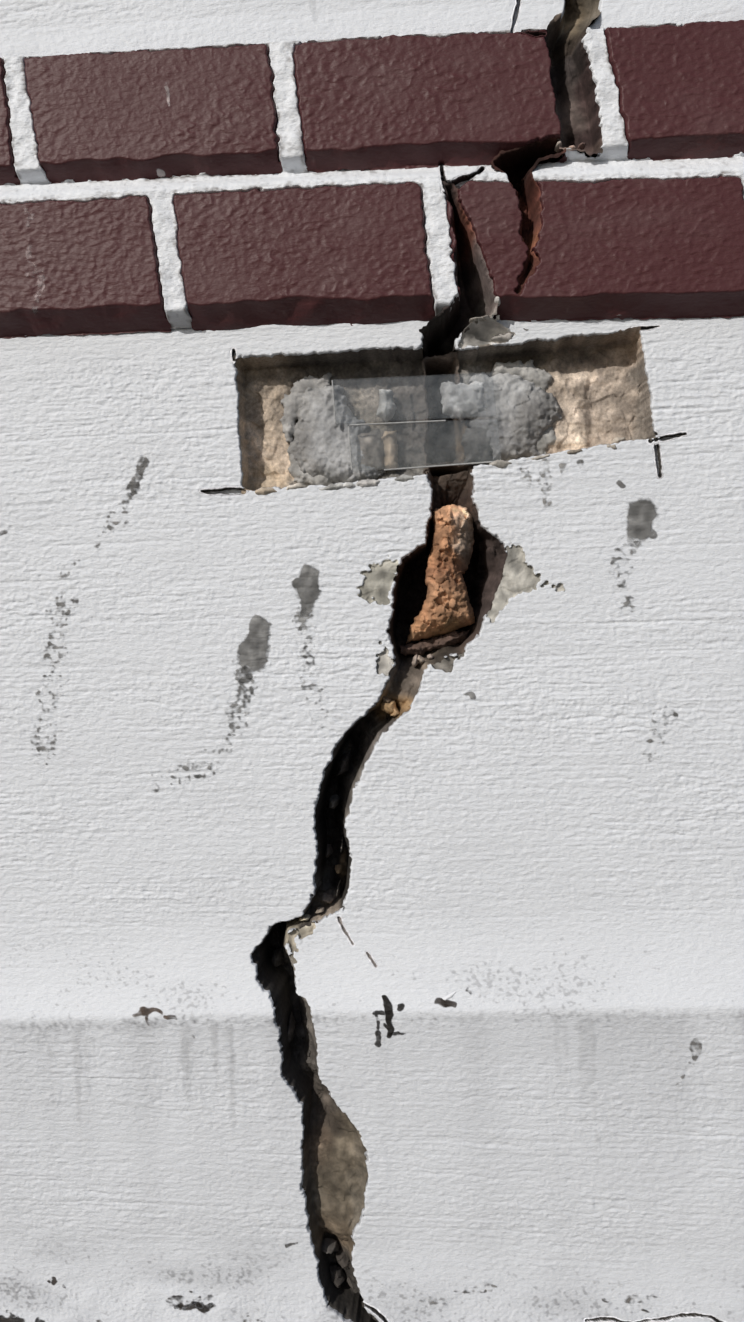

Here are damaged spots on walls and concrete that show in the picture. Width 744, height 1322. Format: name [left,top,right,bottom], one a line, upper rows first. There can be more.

flaking render [356,555,399,605]
flaking render [486,543,565,623]
leakage [36,596,78,702]
leakage [294,610,314,664]
flaking render [376,641,394,676]
crack [251,0,629,1322]
flaking render [432,651,465,673]
leakage [219,666,254,753]
crack [584,1311,727,1322]